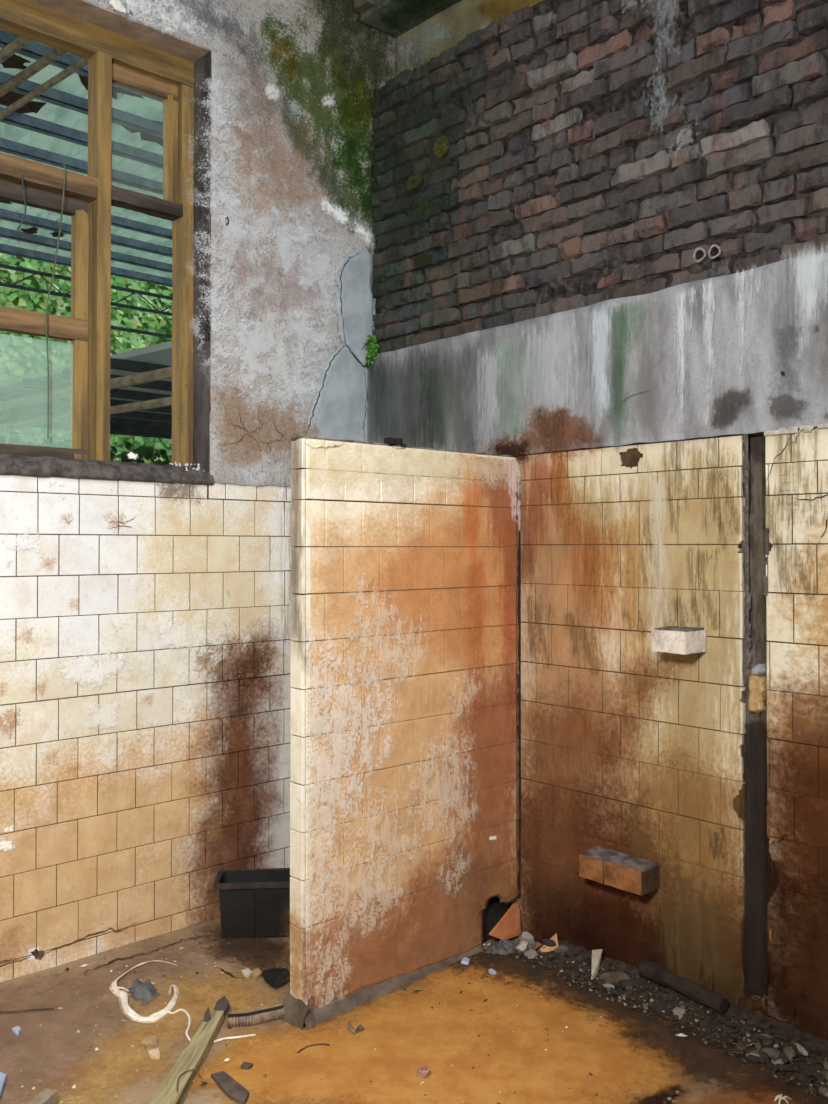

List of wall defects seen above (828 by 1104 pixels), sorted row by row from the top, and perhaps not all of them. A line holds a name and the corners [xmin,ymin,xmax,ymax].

leakage [116,0,208,36]
leakage [261,0,455,245]
crack [228,252,368,453]
leakage [592,309,613,425]
leakage [676,283,715,408]
efflorescence [794,250,827,355]
corrosion [496,442,527,459]
crack [765,431,801,484]
crack [790,494,828,537]
corrosion [773,695,828,793]
spalling [481,893,521,947]
corrosion [517,787,819,1035]